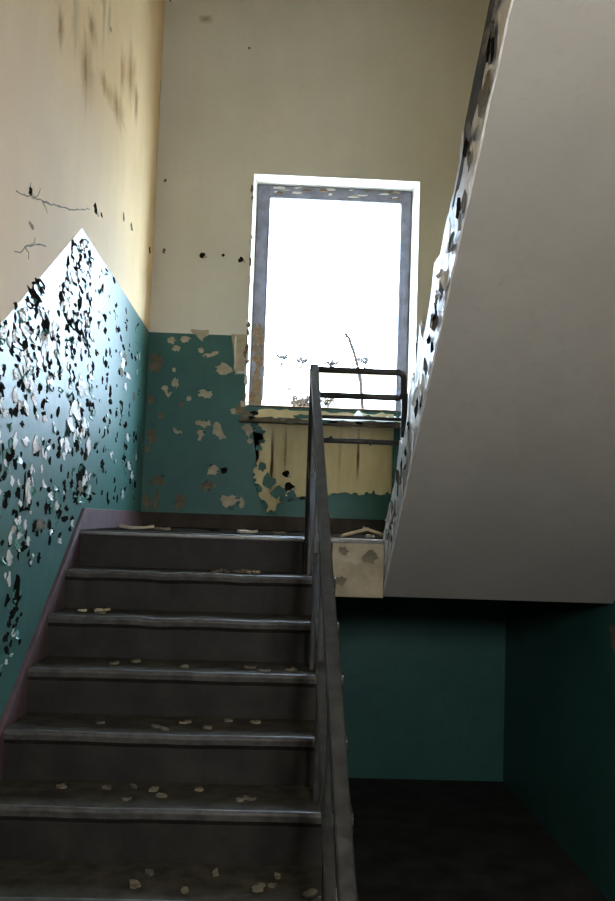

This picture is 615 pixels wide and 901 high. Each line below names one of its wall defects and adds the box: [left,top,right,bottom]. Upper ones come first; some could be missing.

crack [16,183,90,211]
peeling [0,235,450,677]